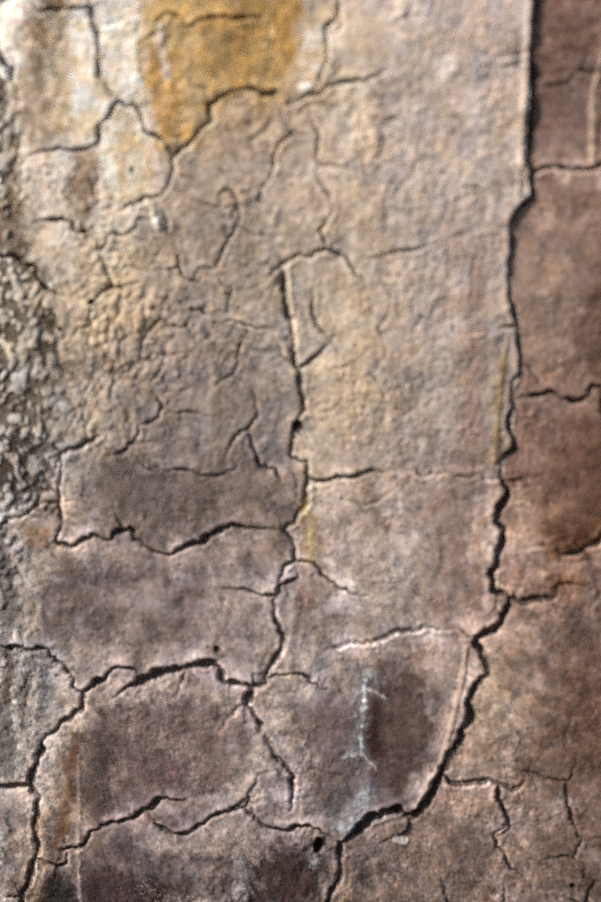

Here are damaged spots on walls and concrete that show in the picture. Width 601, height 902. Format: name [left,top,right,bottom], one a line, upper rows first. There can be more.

crack [0,50,17,90]
damp [0,79,20,157]
crack [0,254,59,295]
damp [70,147,98,236]
crack [31,0,386,332]
rust [136,0,309,163]
damp [0,166,115,782]
crack [0,287,378,902]
damp [91,442,305,621]
damp [283,591,296,671]
crack [327,0,601,902]
damp [31,660,432,902]